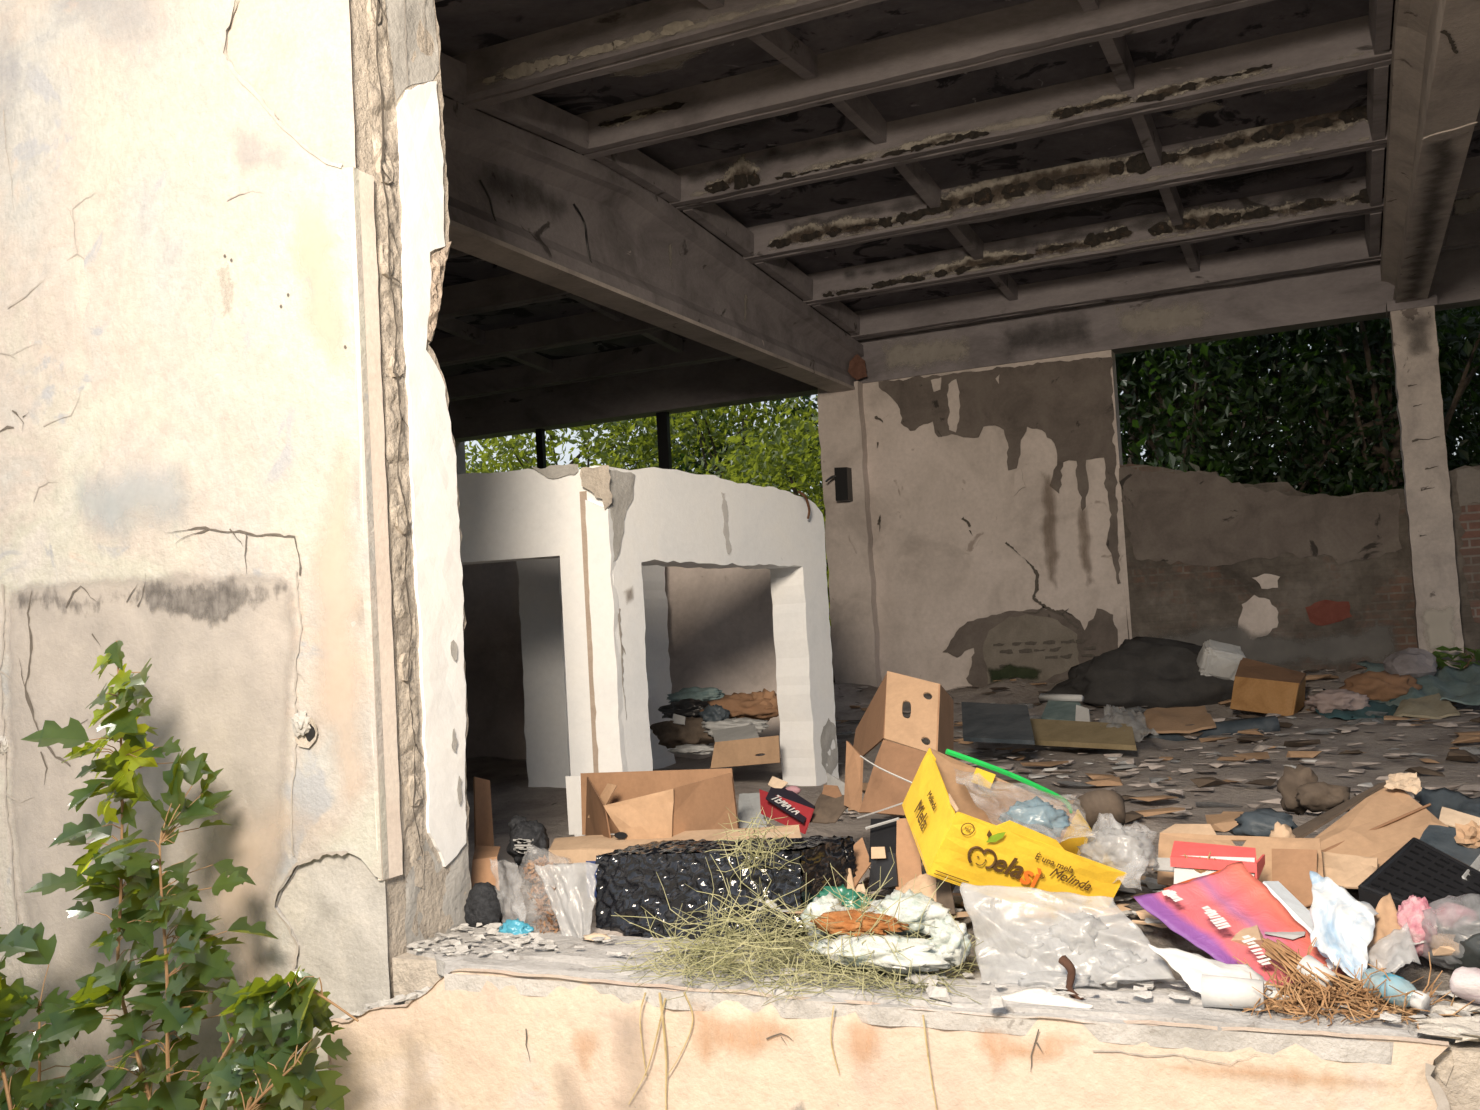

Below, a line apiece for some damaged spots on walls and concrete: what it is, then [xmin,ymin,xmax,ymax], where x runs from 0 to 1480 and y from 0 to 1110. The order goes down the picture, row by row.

spalling [483,0,797,84]
spalling [693,64,1290,196]
spalling [767,105,1369,249]
spalling [1422,122,1477,146]
spalling [823,187,1385,297]
crack [66,578,146,645]
water stain [146,579,246,620]
crack [962,517,1079,629]
water stain [1044,481,1056,575]
water stain [1079,511,1090,570]
flaking render [848,354,1402,638]
flaking render [1456,467,1480,506]